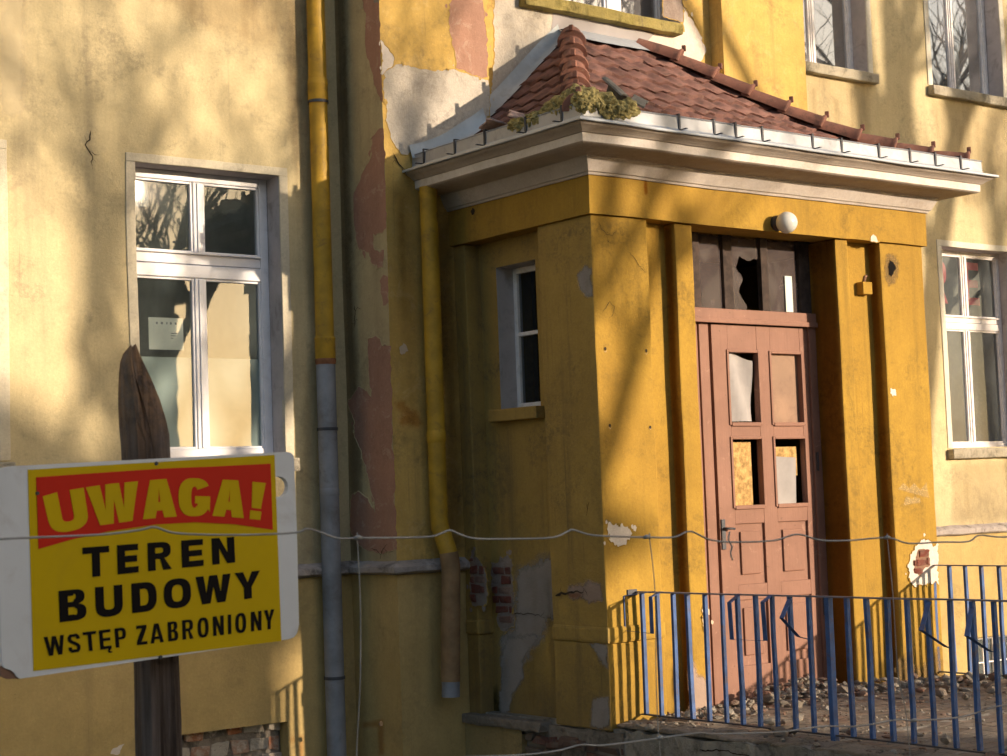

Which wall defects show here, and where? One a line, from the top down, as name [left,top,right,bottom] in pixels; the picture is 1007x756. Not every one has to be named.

flaking render [648,0,707,62]
crack [85,131,95,169]
flaking render [352,0,553,271]
peeling [348,335,408,555]
spalling [603,519,637,548]
spalling [906,533,939,588]
flaking render [466,545,553,712]